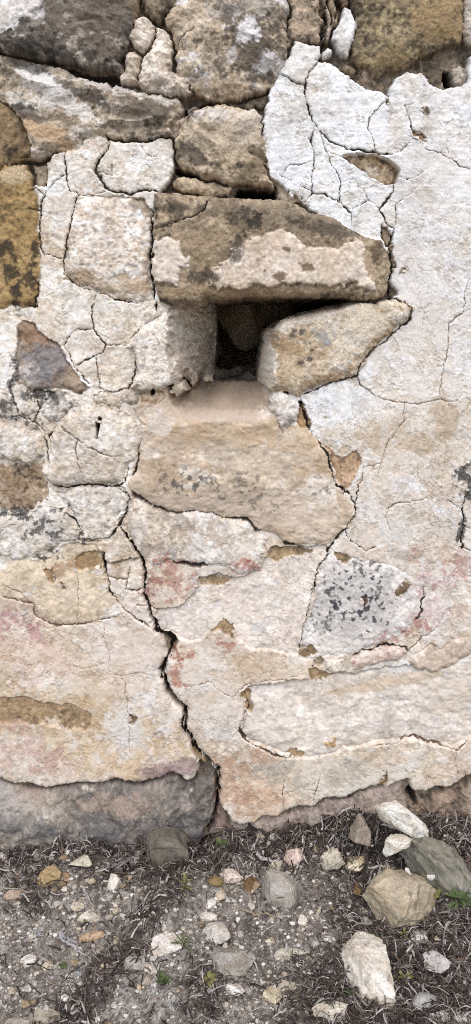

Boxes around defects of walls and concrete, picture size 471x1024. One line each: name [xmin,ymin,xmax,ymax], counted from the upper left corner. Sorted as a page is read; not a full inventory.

spalling [343,152,400,185]
crack [32,139,212,393]
crack [281,3,470,645]
spalling [325,446,362,495]
spalling [334,552,352,565]
crack [3,380,298,827]
crack [353,591,426,655]
spalling [393,579,413,597]
spalling [0,696,92,732]
crack [376,734,468,771]